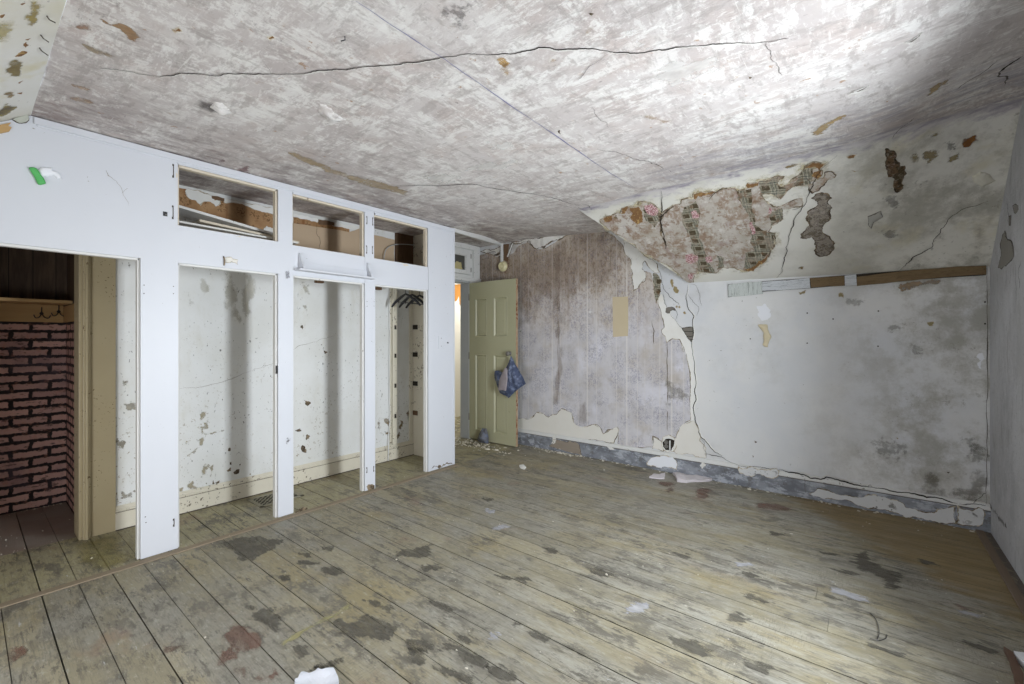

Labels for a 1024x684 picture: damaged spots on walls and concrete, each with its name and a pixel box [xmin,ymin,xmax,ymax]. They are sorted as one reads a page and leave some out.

crack [100,38,789,80]
crack [958,57,1021,89]
crack [781,165,826,273]
spalling [998,204,1019,269]
peeling [623,240,659,291]
peeling [646,279,706,470]
crack [659,201,1021,523]
peeling [518,408,619,455]
peeling [738,456,779,479]
peeling [809,488,986,527]